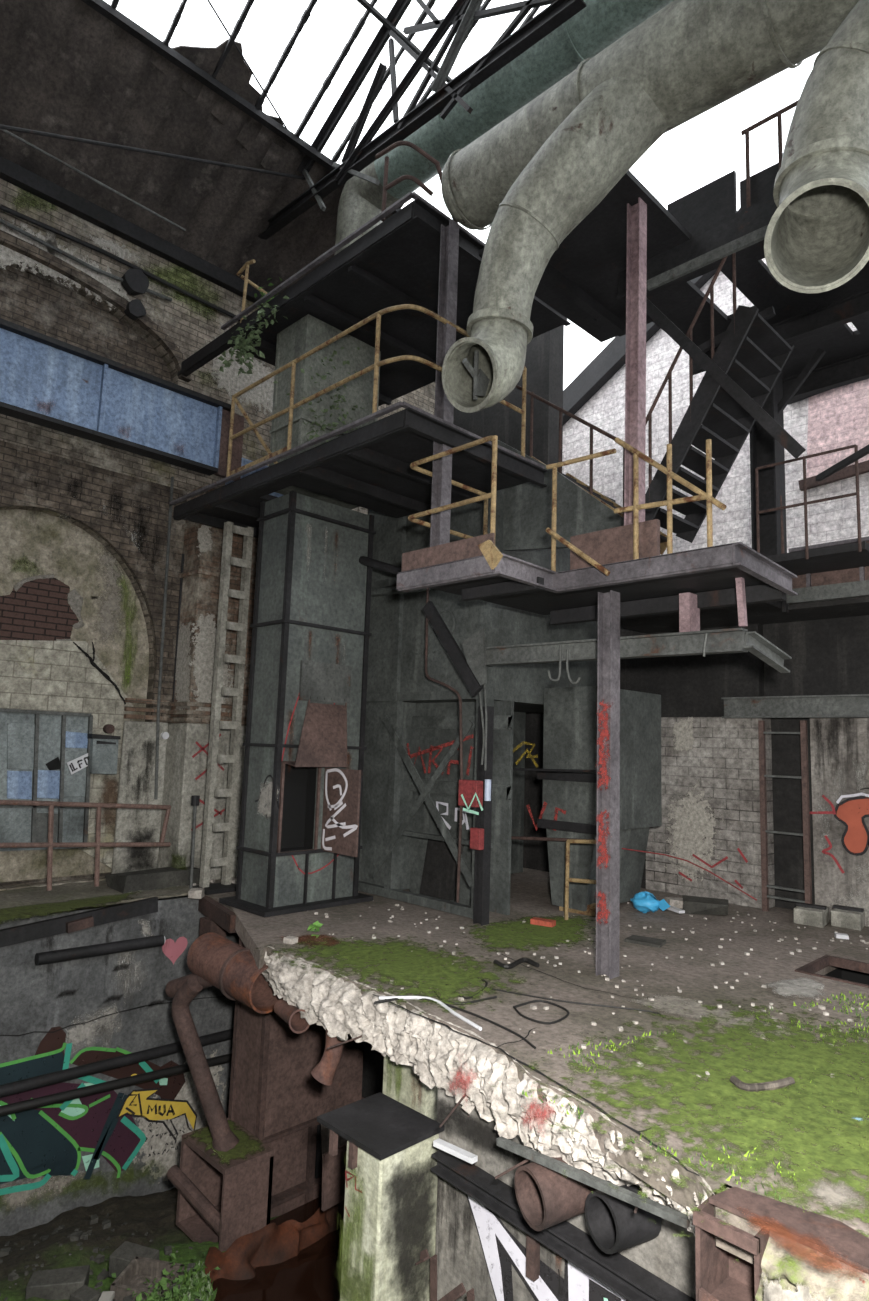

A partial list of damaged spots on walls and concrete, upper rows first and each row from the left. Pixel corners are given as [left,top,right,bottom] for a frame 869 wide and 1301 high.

spalling [0,574,98,641]
crack [73,642,126,705]
damp [832,867,869,922]
spalling [262,936,715,1236]
damp [340,1203,372,1301]
rust [750,1217,860,1277]
spalling [761,1272,832,1301]